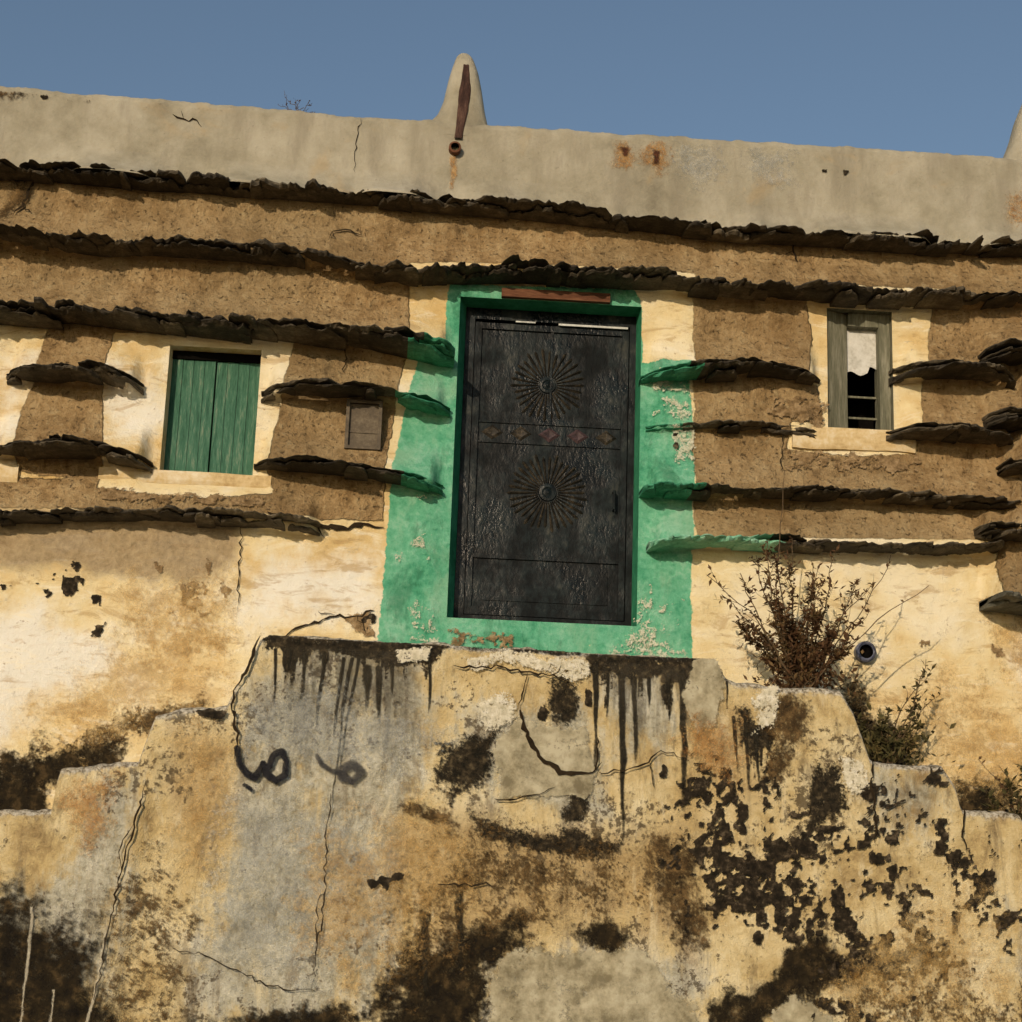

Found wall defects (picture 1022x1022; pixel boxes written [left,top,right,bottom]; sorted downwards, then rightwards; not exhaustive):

rust [616,142,668,173]
spalling [36,561,84,598]
spalling [90,622,106,637]
crack [230,636,260,759]
crack [286,610,374,636]
crack [454,664,681,801]
flaking render [609,584,725,733]
damp [720,669,814,788]
damp [0,635,712,1022]
damp [804,762,850,830]
crack [165,793,331,993]
damp [706,930,1022,1022]